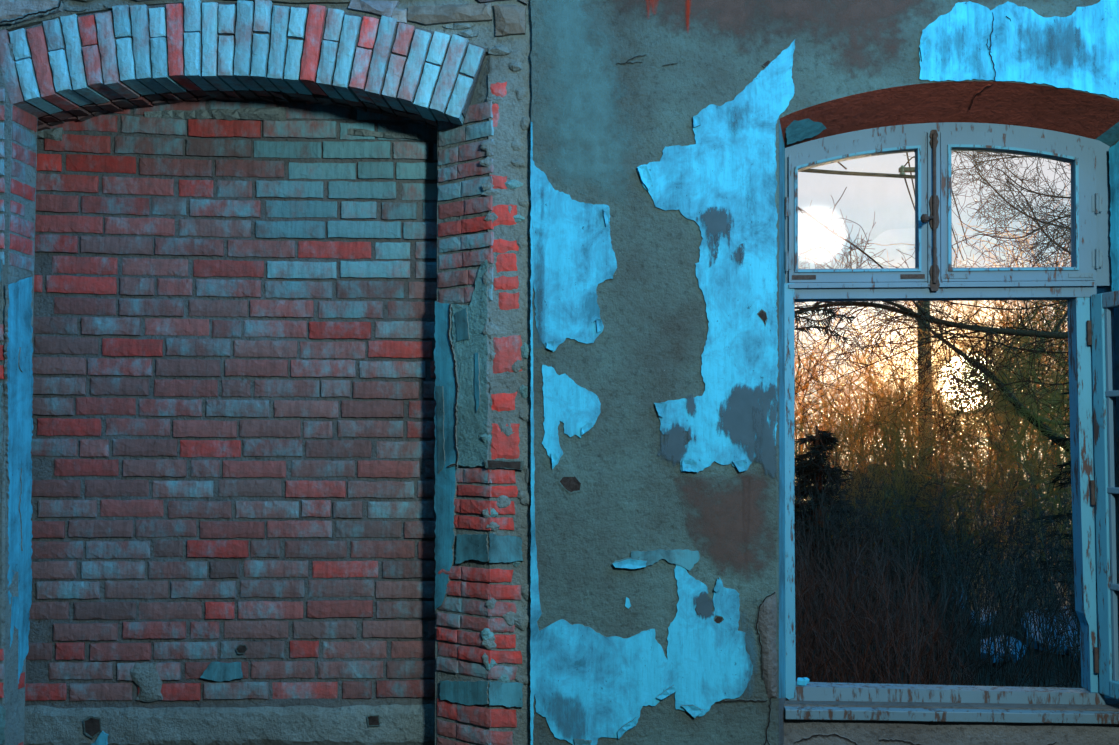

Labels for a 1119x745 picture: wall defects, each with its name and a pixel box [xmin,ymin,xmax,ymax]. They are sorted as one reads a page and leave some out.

crack [969,13,1011,110]
peeling [919,0,1119,100]
peeling [637,40,827,473]
peeling [1109,141,1119,291]
peeling [0,277,34,684]
peeling [434,74,753,745]
crack [715,591,930,745]